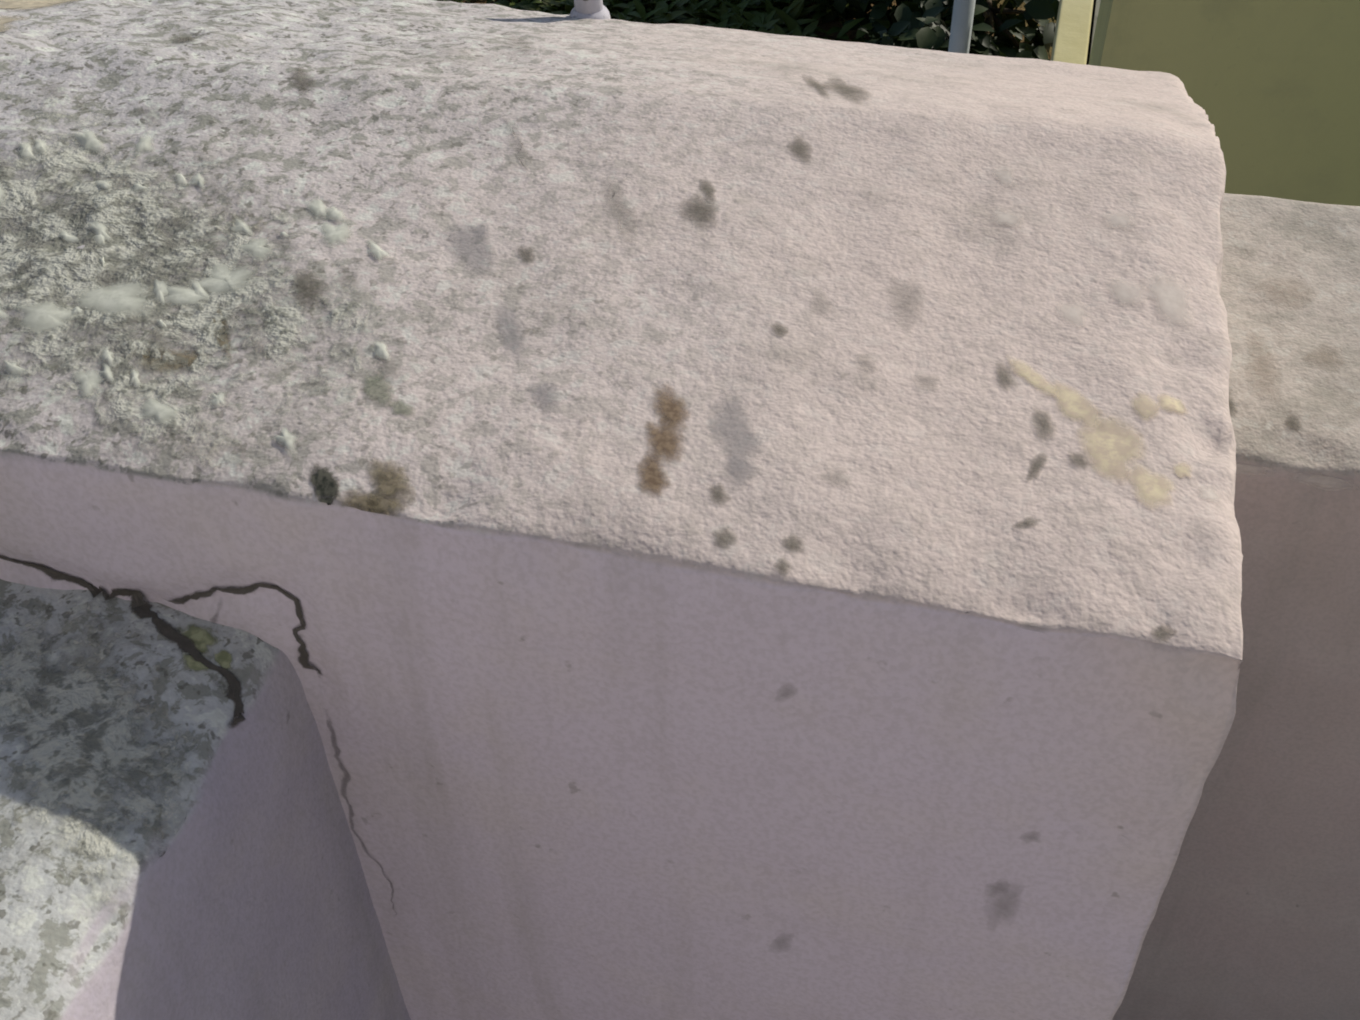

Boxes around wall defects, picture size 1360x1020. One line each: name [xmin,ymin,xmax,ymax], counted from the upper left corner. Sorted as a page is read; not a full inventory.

leakage [810,81,859,97]
leakage [793,141,807,156]
leakage [690,184,714,220]
leakage [311,466,339,505]
crack [0,555,321,728]
spalling [0,619,182,877]